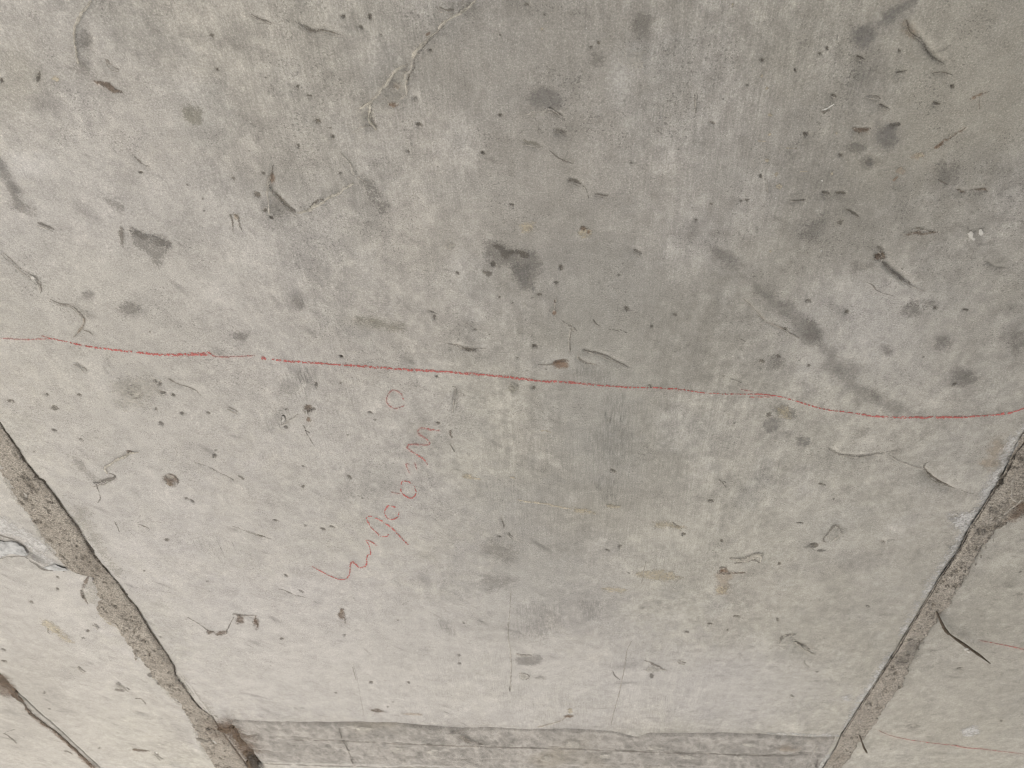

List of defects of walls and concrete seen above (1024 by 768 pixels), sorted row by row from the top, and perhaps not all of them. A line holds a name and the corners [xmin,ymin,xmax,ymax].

peeling [0,517,69,572]
crack [842,443,1024,736]